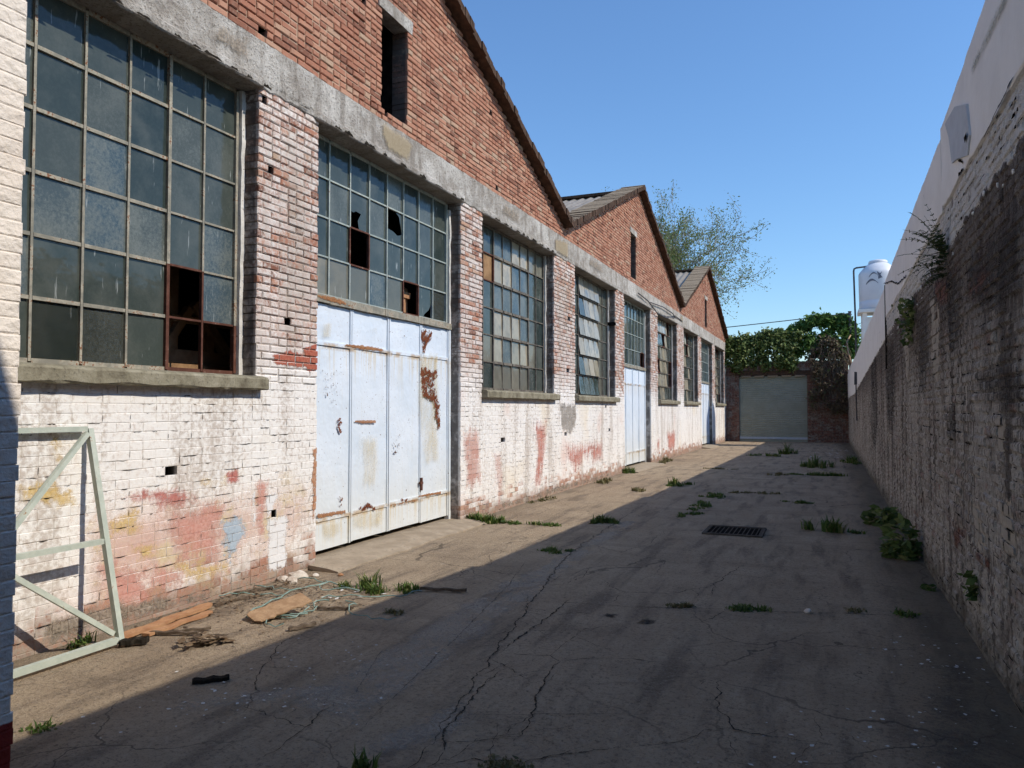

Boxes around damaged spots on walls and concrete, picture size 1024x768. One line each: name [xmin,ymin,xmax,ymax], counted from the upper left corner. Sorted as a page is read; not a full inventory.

peeling [272,343,318,372]
corrosion [420,330,440,430]
water stain [560,403,576,433]
crack [201,504,750,768]